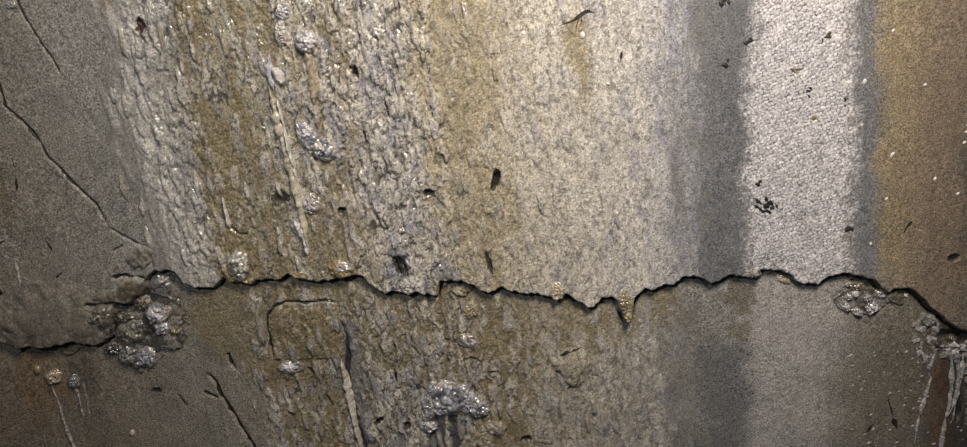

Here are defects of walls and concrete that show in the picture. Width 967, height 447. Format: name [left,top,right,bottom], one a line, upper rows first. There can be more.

crack [17,0,62,75]
damp [80,0,478,297]
crack [0,84,180,355]
spalling [87,272,192,373]
crack [177,353,256,447]
crack [223,271,351,380]
crack [327,394,367,447]
damp [240,300,475,447]
crack [452,277,492,296]
damp [471,0,891,447]
crack [566,269,967,336]
damp [883,21,967,447]